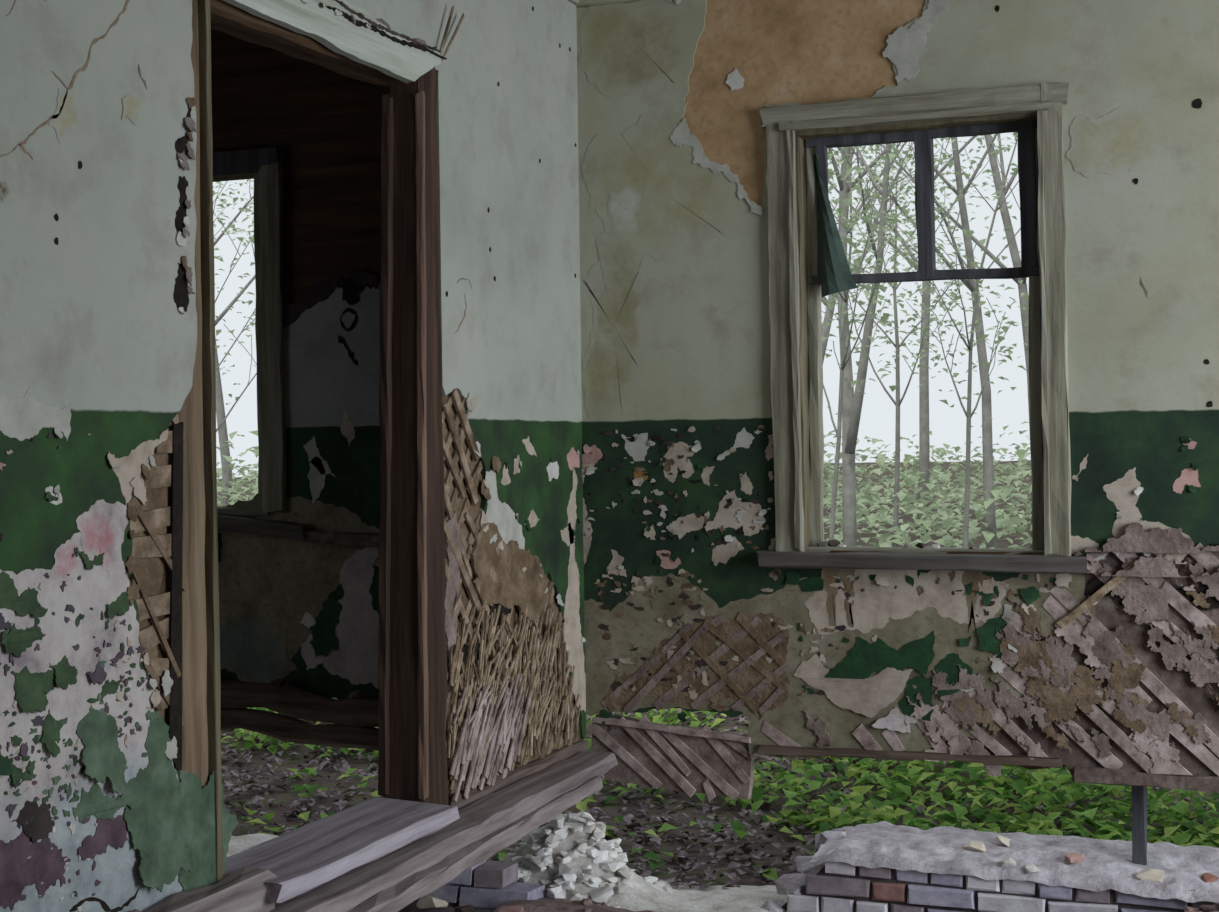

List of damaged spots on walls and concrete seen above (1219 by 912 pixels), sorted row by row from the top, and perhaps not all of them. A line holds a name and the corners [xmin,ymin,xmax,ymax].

crack [0,0,130,160]
spalling [173,97,197,314]
spalling [301,0,447,59]
spalling [670,0,950,216]
peeling [0,389,71,471]
peeling [341,410,355,447]
peeling [0,414,194,912]
peeling [218,436,380,689]
spalling [442,388,1219,803]